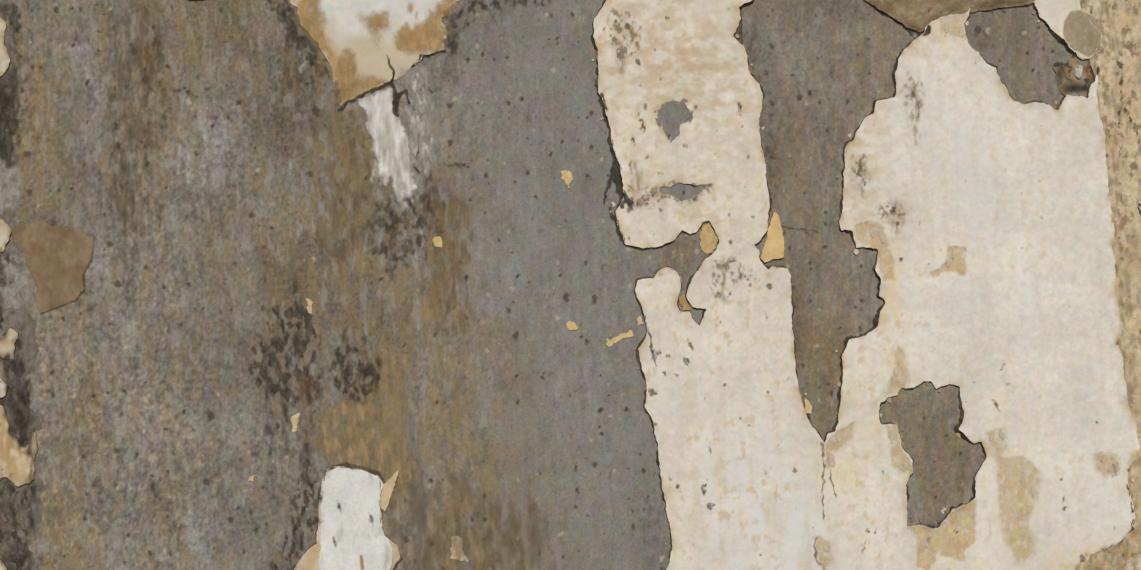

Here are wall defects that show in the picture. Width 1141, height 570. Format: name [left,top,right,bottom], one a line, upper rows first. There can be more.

water stain [249,305,322,412]
water stain [274,346,423,570]
peeling [0,0,732,570]
peeling [733,0,925,466]
peeling [879,367,1004,570]
peeling [944,0,1141,570]